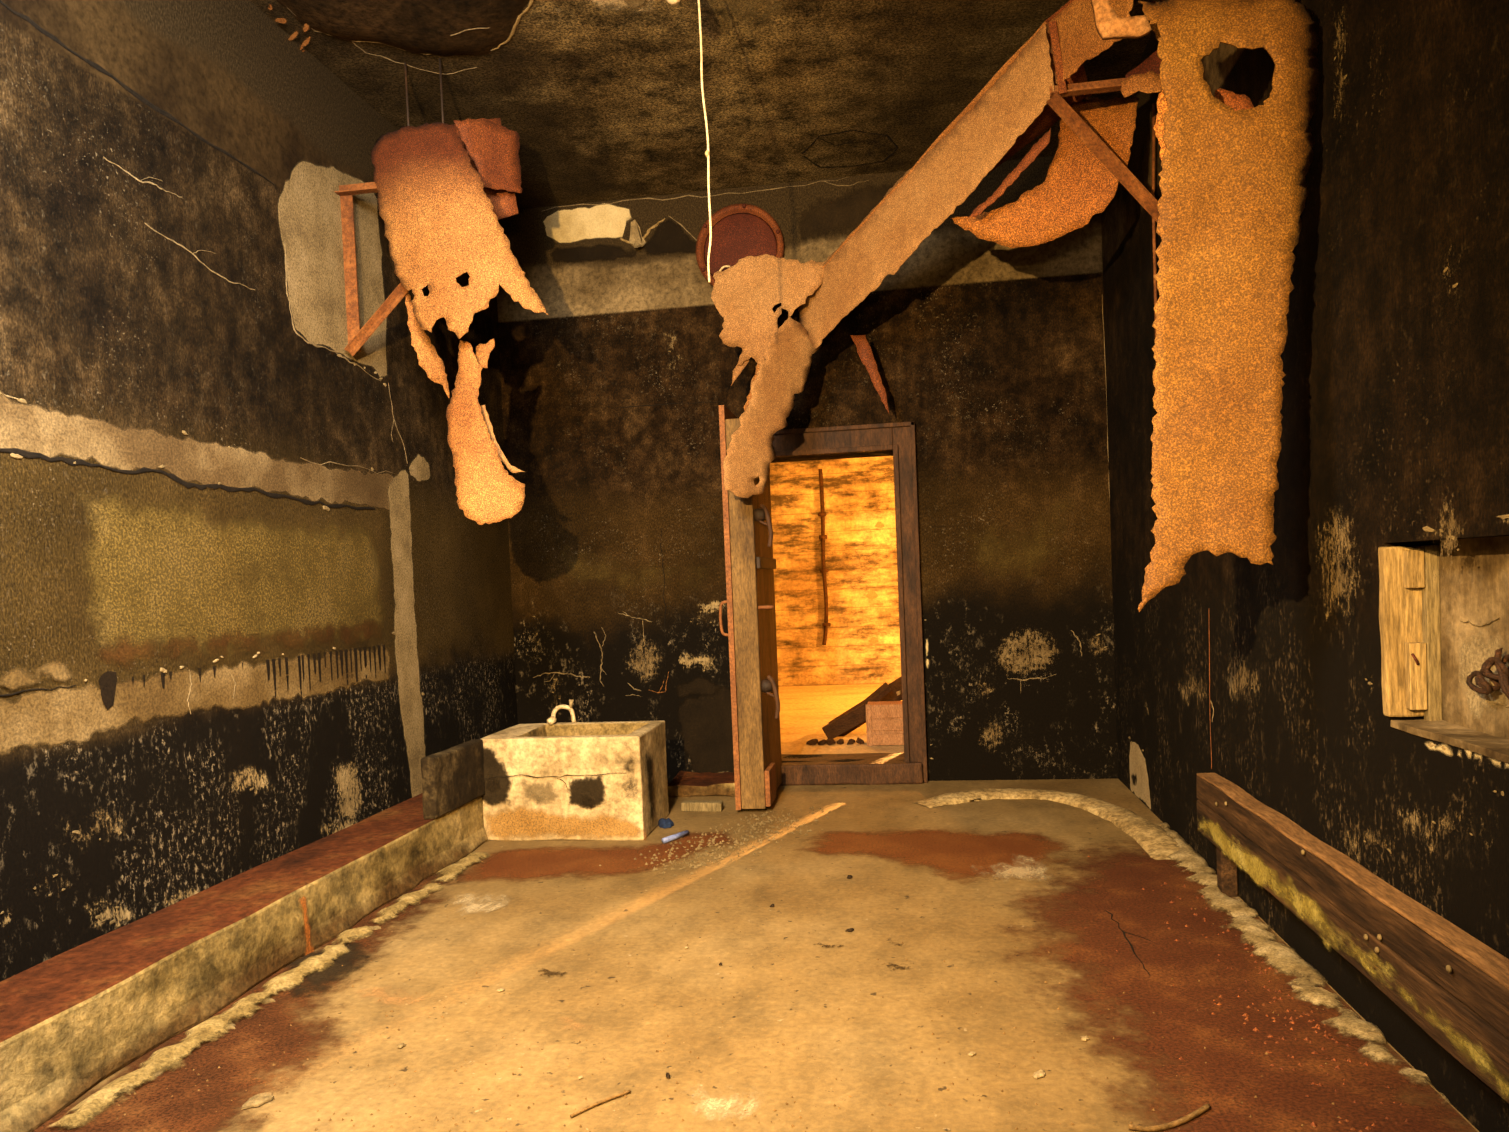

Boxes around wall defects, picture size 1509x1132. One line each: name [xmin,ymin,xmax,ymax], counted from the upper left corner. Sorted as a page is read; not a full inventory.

peeling [543,203,697,255]
flaking render [278,161,387,387]
damp [690,600,726,623]
damp [997,629,1059,680]
damp [625,638,734,773]
damp [979,716,1002,752]
damp [481,748,605,809]
damp [626,754,655,819]
damp [286,943,369,997]
rust [32,808,731,1132]
rust [810,830,1476,1132]